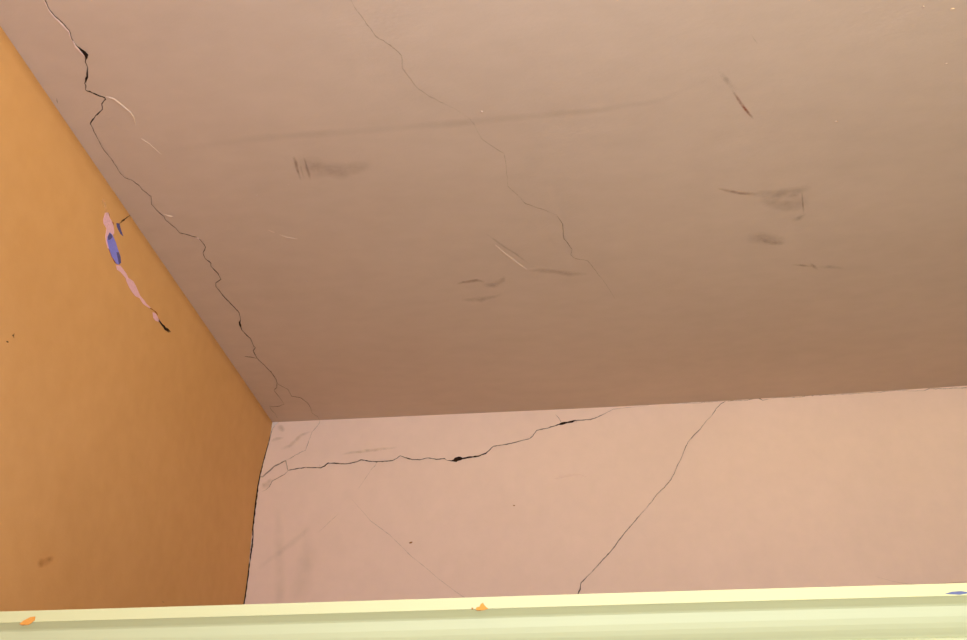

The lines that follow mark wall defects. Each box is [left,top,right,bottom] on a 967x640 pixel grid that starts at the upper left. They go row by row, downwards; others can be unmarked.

peeling [103,212,171,332]
crack [43,0,310,406]
crack [244,414,603,604]
crack [578,399,763,594]